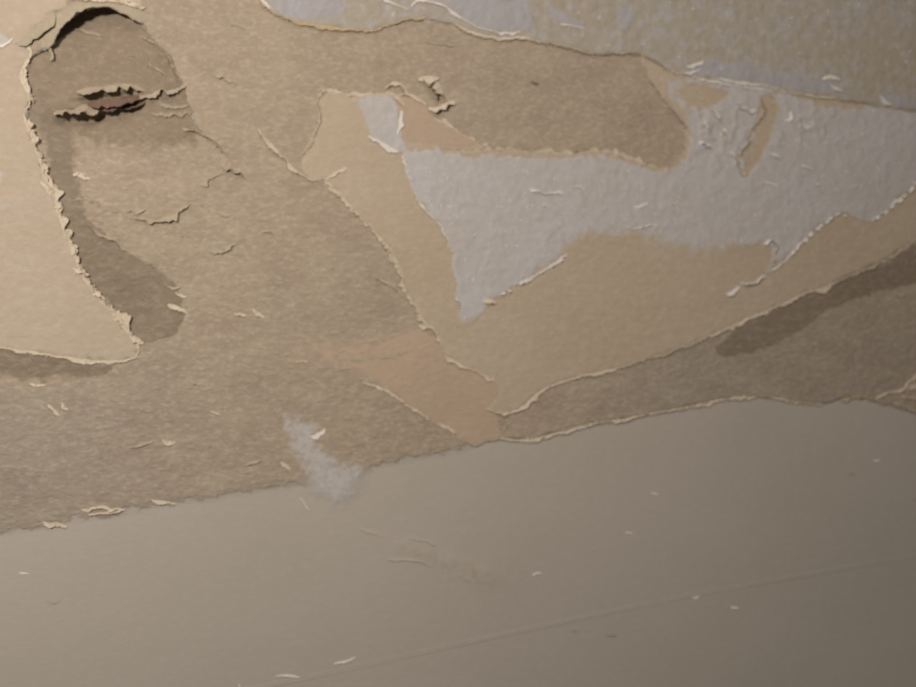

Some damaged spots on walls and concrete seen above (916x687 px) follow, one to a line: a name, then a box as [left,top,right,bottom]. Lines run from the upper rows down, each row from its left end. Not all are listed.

spalling [16,0,237,348]
damp [713,242,916,360]